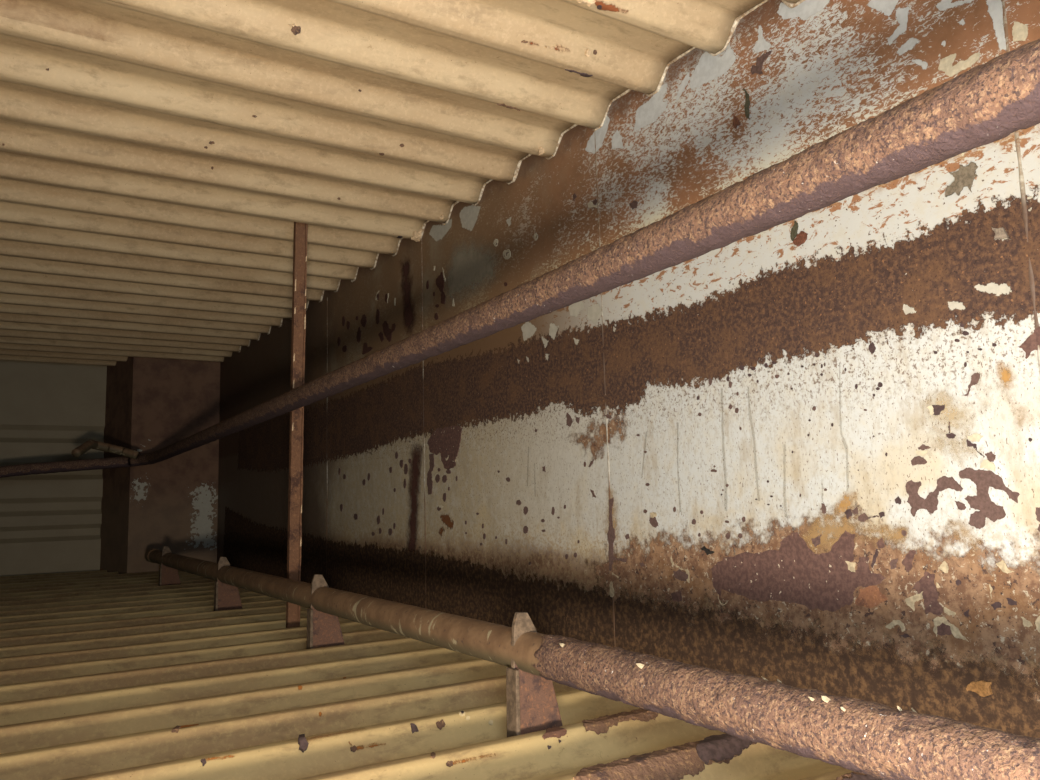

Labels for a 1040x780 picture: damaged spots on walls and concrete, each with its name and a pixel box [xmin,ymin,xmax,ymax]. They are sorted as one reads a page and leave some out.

peeling [866,0,981,77]
peeling [1012,21,1028,42]
peeling [676,47,736,102]
peeling [585,116,623,154]
peeling [397,205,481,242]
peeling [974,282,1012,296]
peeling [1018,326,1040,359]
rust [237,413,290,473]
rust [301,185,1040,740]
peeling [895,404,1020,529]
rust [223,507,288,578]
peeling [711,507,969,642]